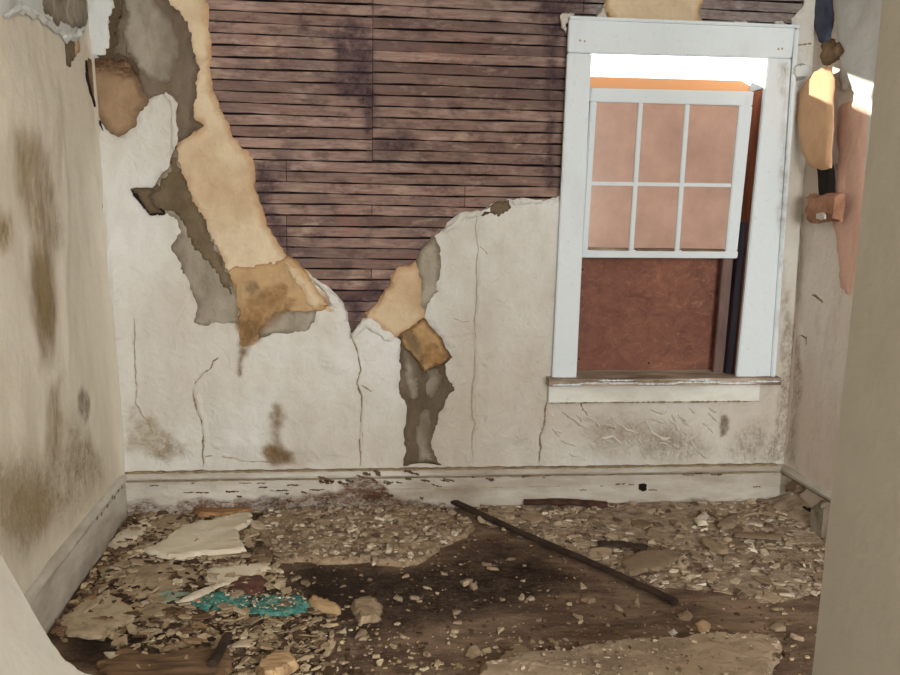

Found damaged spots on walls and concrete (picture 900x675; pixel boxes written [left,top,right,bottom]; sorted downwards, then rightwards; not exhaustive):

crack [192,357,274,466]
flaking render [0,0,558,503]
crack [351,335,372,465]
crack [453,217,487,458]
peeling [790,0,882,296]